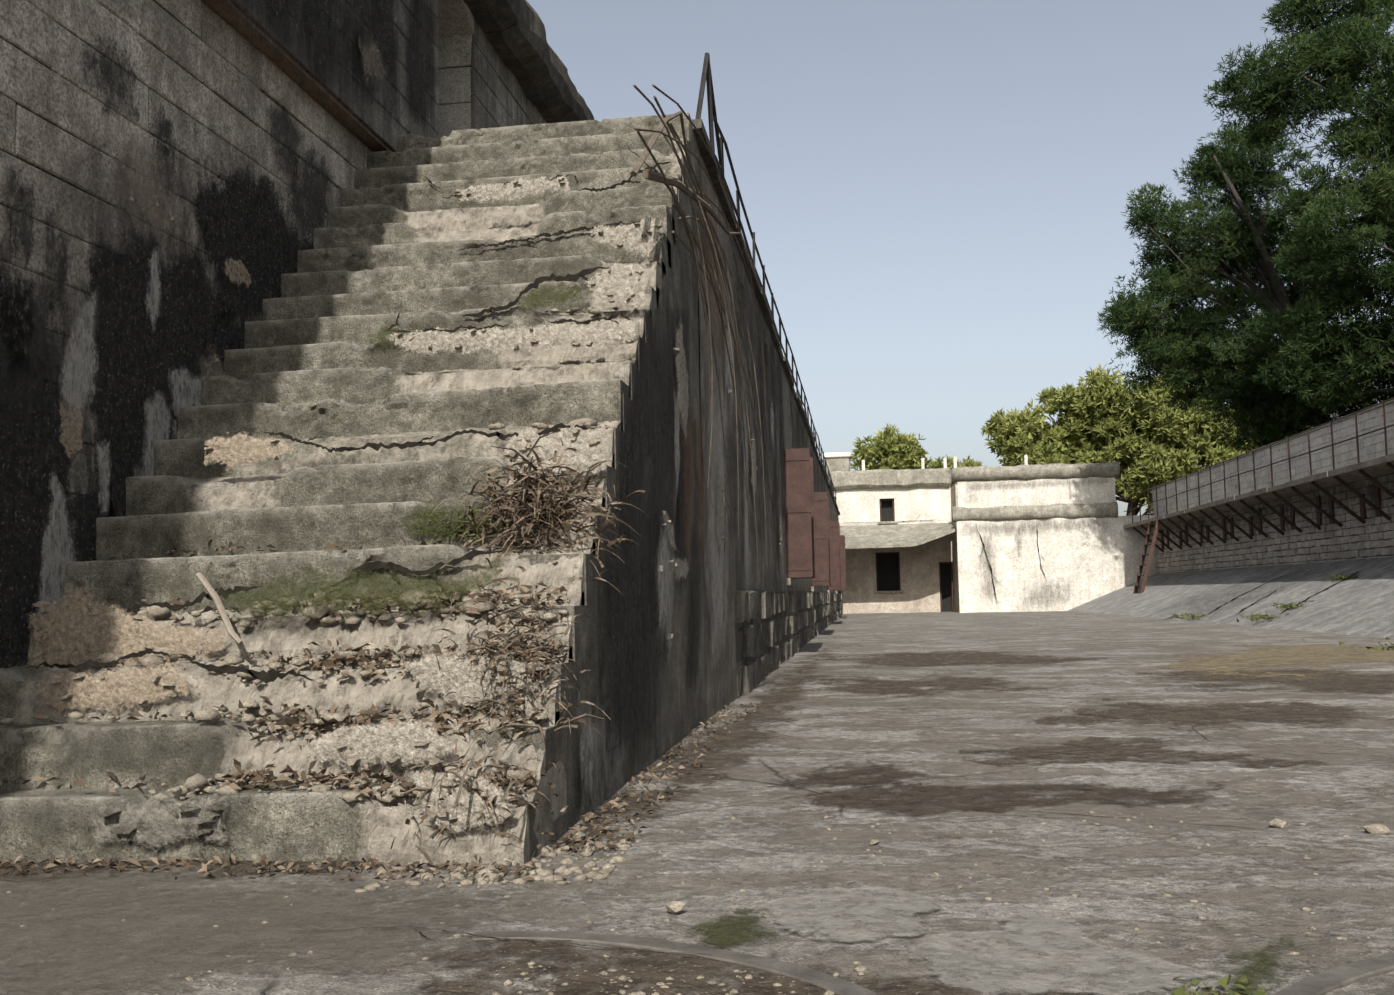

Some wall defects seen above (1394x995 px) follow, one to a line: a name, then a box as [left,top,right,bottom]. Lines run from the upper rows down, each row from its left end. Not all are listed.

leakage [374,0,396,74]
crack [386,266,631,333]
leakage [0,34,335,668]
crack [264,423,608,453]
crack [340,550,498,582]
crack [141,586,264,612]
crack [25,648,315,684]